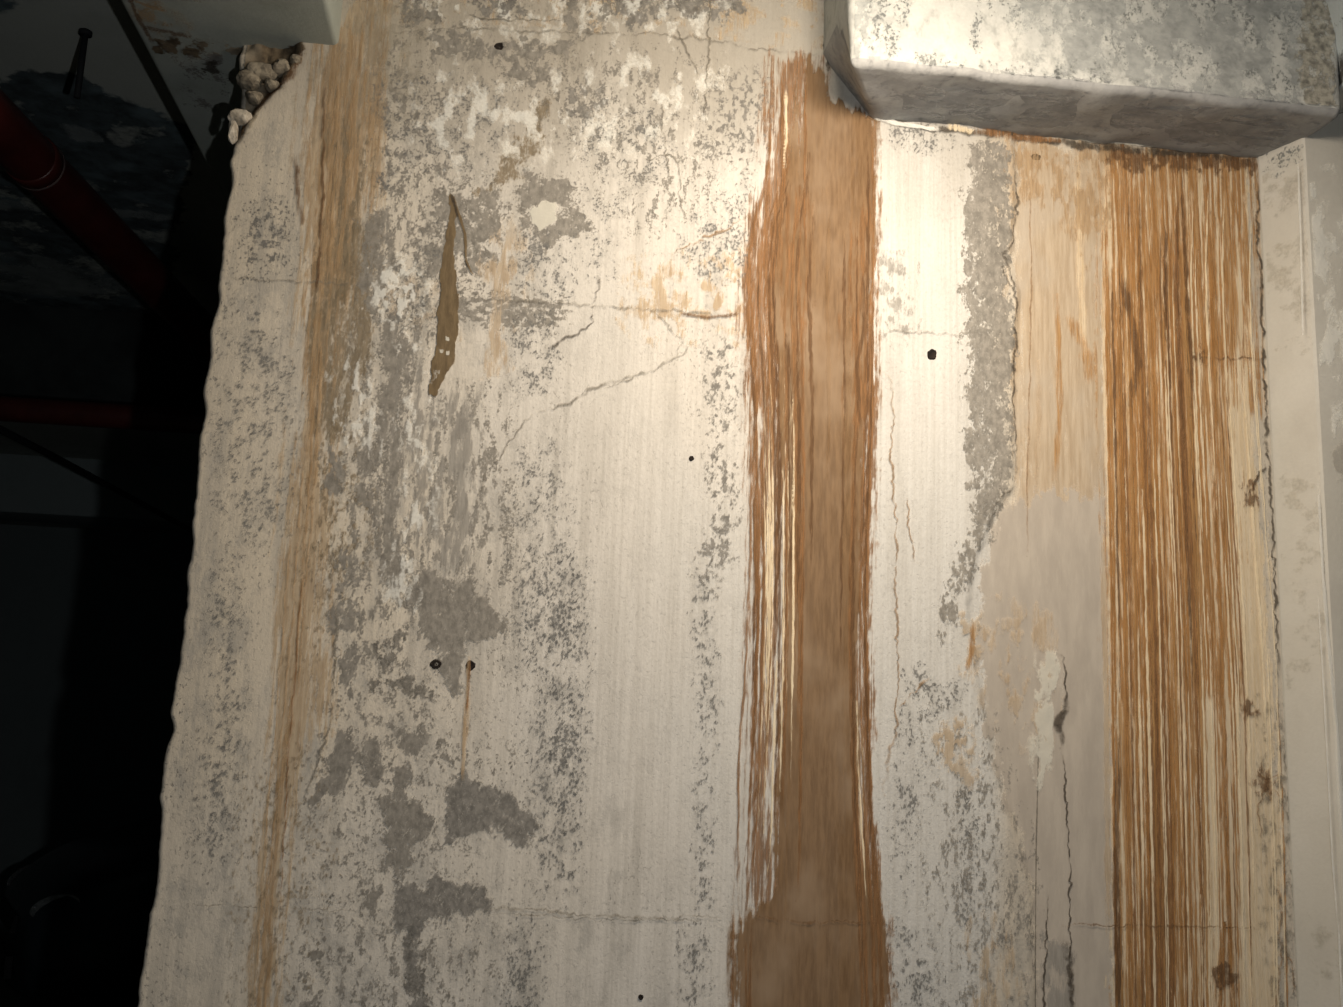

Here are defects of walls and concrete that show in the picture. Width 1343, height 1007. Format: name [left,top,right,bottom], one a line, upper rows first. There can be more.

peeling [0,171,158,315]
peeling [0,70,196,271]
spalling [149,37,305,145]
leakage [373,194,525,396]
leakage [616,266,723,333]
rust [248,0,389,1007]
peeling [186,0,774,1007]
rust [683,50,893,1007]
rust [1095,144,1288,1007]
rust [461,666,470,774]